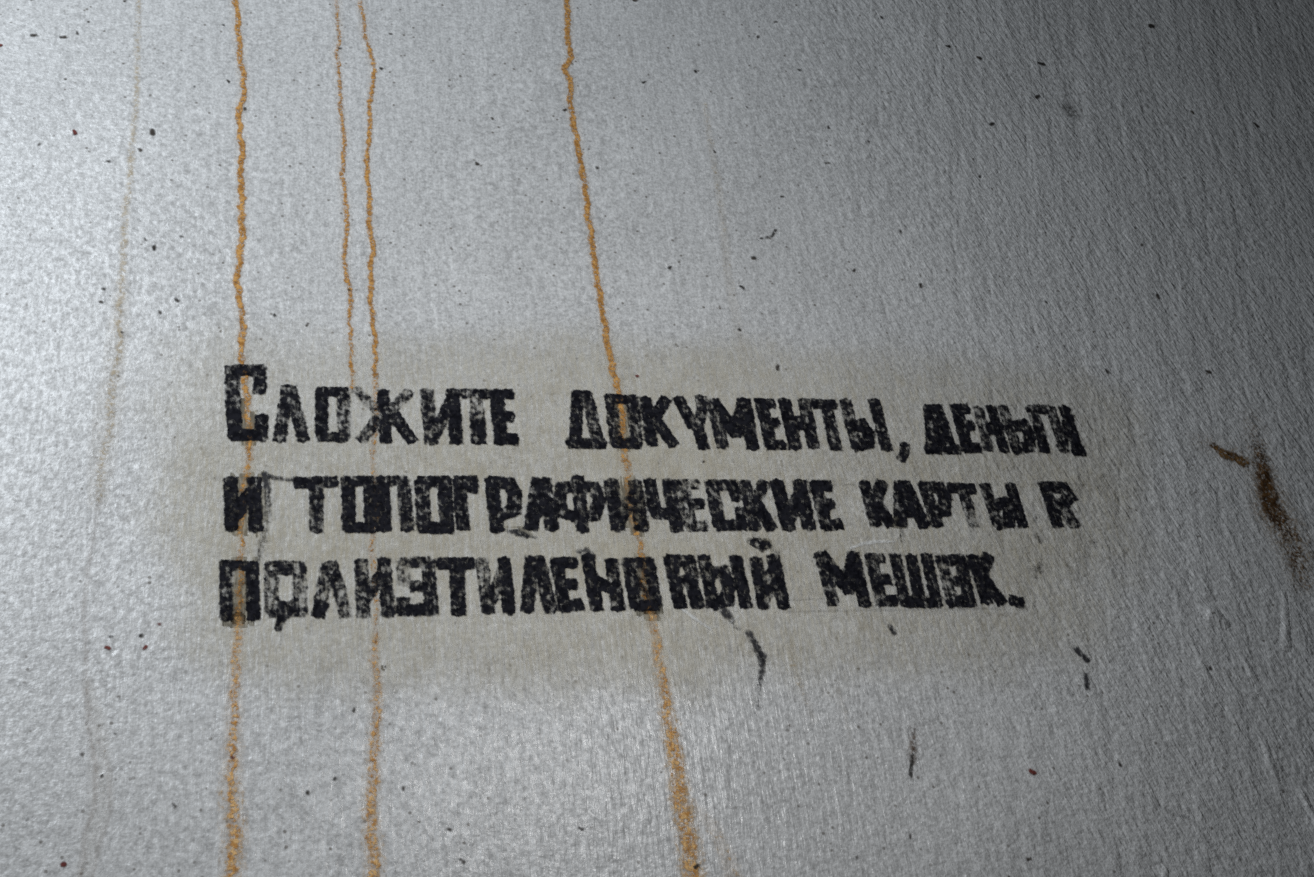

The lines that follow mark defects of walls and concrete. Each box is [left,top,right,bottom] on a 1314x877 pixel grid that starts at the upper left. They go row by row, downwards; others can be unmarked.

corrosion [221,517,245,877]
corrosion [232,0,252,491]
corrosion [335,5,379,414]
corrosion [365,593,382,877]
corrosion [561,0,704,877]
corrosion [1210,425,1311,587]